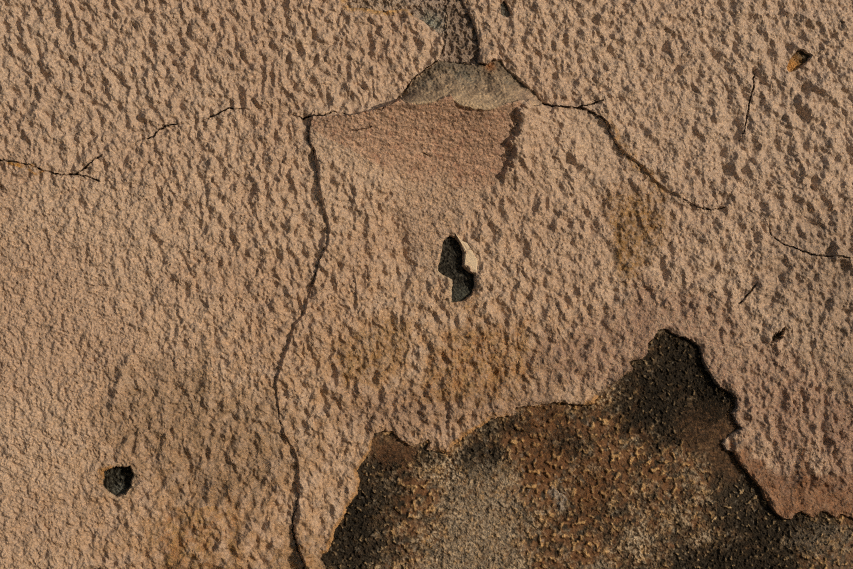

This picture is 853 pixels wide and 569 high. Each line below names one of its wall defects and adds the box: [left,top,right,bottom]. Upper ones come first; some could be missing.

flaking render [341,0,542,111]
flaking render [787,50,810,72]
crack [543,100,621,150]
flaking render [436,233,478,302]
flaking render [99,465,136,500]
flaking render [321,329,853,569]